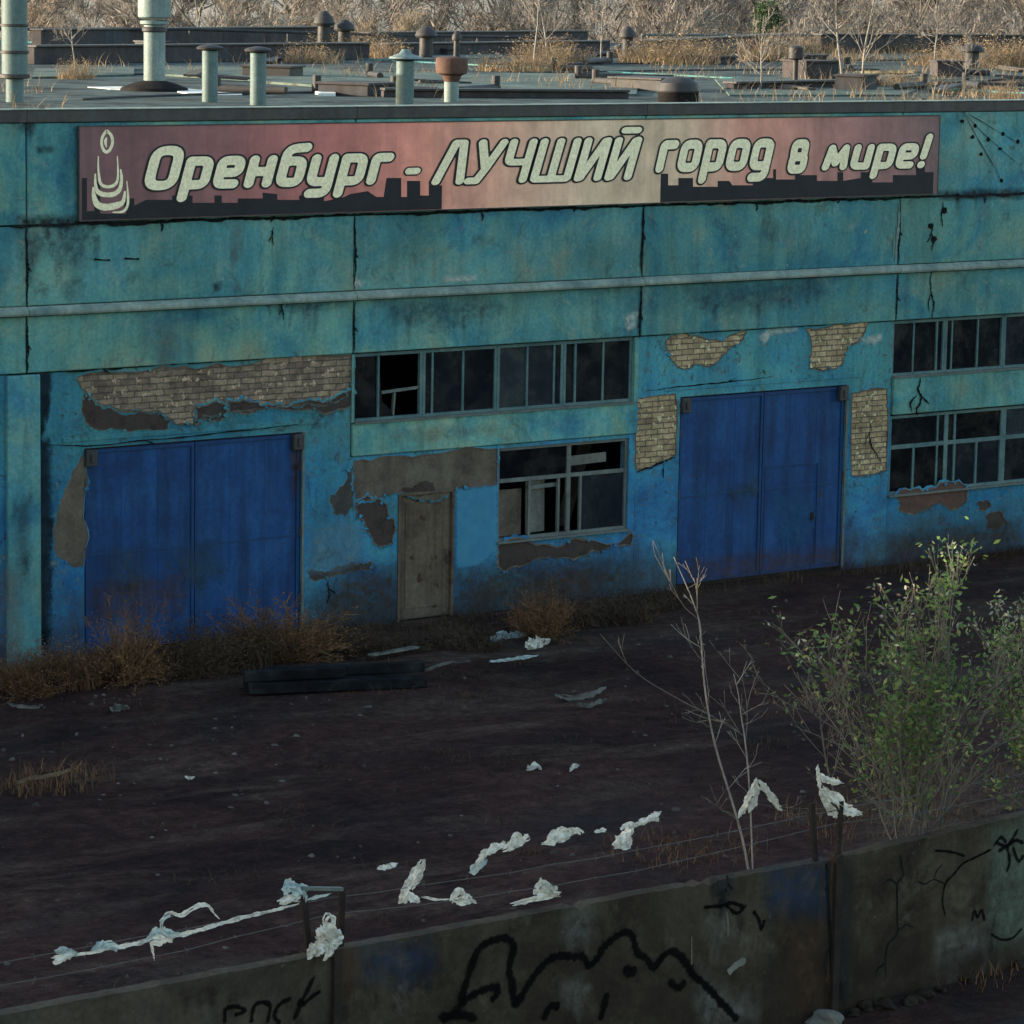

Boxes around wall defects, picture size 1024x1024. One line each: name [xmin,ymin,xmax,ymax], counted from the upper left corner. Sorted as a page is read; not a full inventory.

crack [10,111,1024,371]
flaking render [662,329,747,371]
flaking render [804,322,869,373]
flaking render [75,353,357,433]
flaking render [632,391,680,474]
flaking render [848,385,891,479]
crack [909,378,929,416]
peeling [52,455,90,569]
peeling [328,446,500,550]
spalling [494,529,636,575]
spalling [894,479,1009,531]